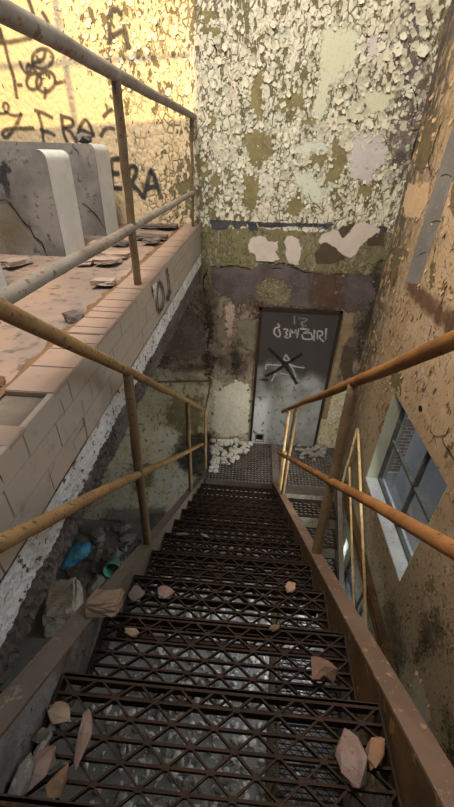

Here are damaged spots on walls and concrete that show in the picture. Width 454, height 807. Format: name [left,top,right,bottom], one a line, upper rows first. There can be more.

water stain [0,161,13,207]
crack [0,199,48,256]
flaking render [44,0,454,419]
water stain [165,396,205,434]
crack [429,427,454,461]